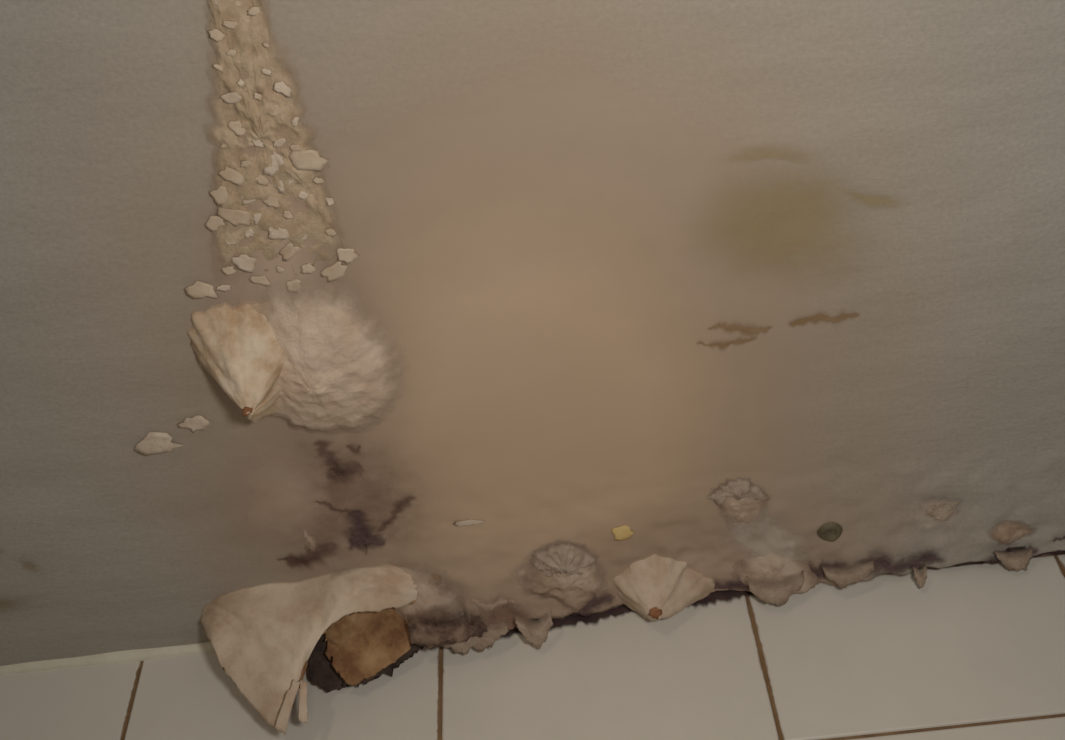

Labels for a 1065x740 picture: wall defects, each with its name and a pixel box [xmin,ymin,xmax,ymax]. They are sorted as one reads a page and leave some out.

peeling [185,0,360,304]
damp [248,118,796,650]
peeling [135,415,210,456]
peeling [747,570,805,606]
damp [809,563,847,577]
peeling [822,561,874,588]
damp [861,548,1038,573]
flaking render [200,563,440,734]